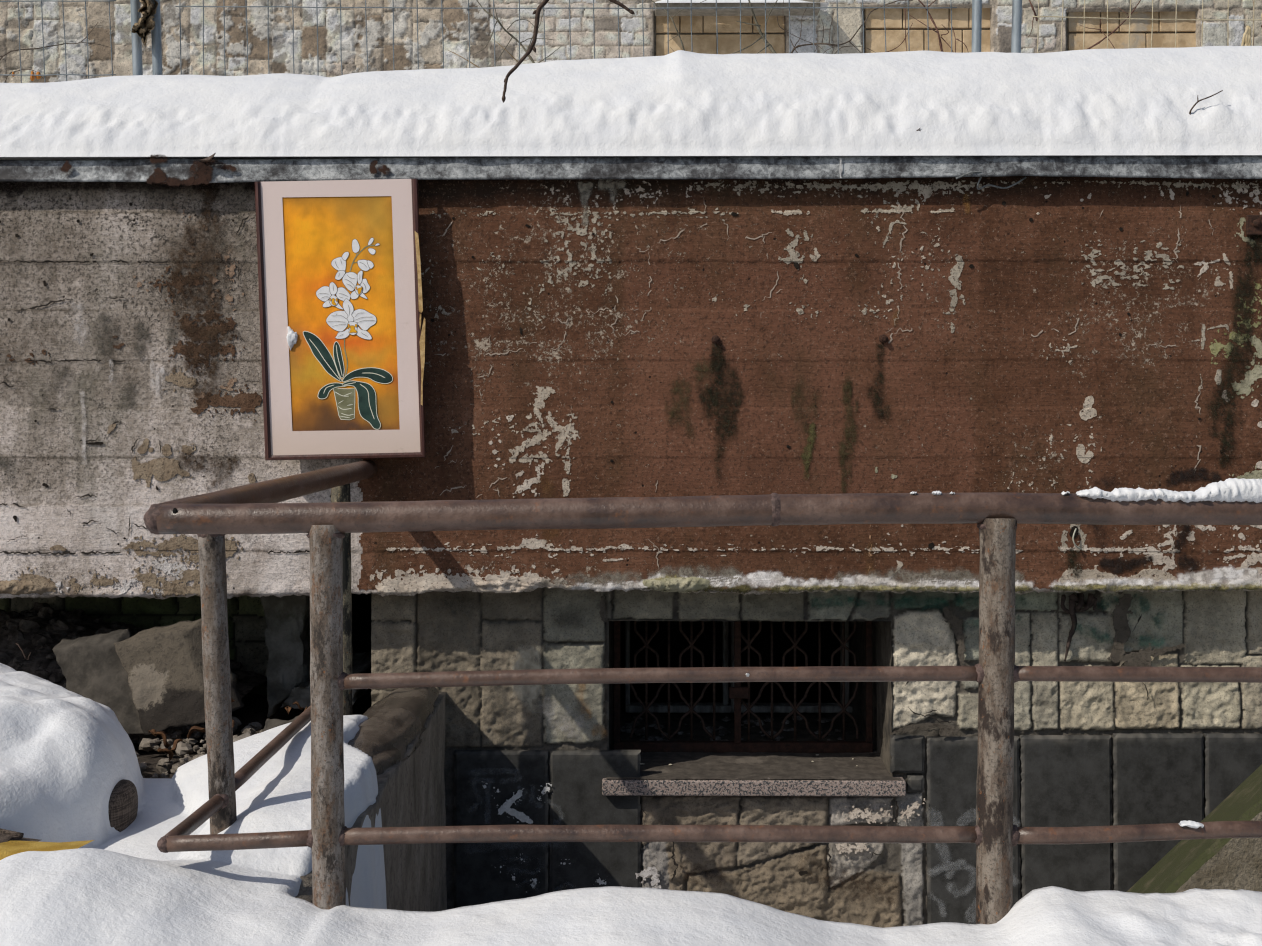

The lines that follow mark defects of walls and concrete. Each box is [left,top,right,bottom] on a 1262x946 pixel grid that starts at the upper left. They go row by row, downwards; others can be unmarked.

corrosion [146,155,237,186]
leakage [0,181,255,399]
spalling [125,438,196,490]
peeling [449,386,580,498]
leakage [671,344,743,477]
leakage [839,344,890,492]
peeling [519,180,1262,369]
leakage [1208,235,1262,467]
peeling [370,524,980,596]